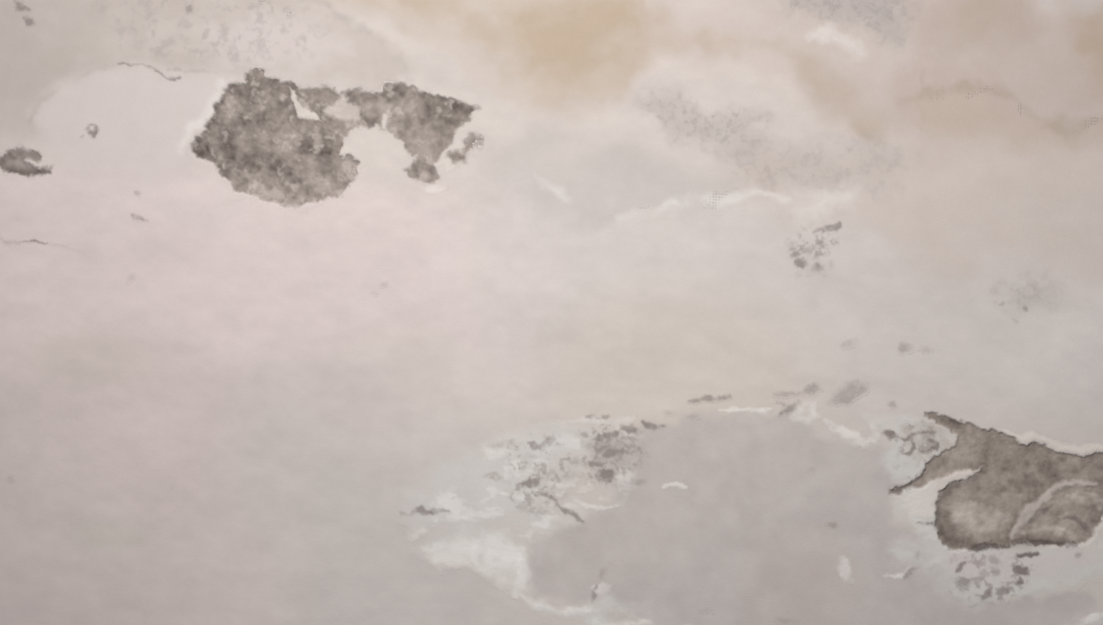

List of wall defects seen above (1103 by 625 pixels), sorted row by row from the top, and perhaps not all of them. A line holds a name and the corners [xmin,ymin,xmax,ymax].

flaking render [0,54,485,213]
damp [0,0,1103,324]
spalling [398,504,452,518]
damp [396,403,658,625]
spalling [480,393,733,521]
spalling [771,378,870,417]
damp [859,408,1103,616]
flaking render [876,399,1103,608]